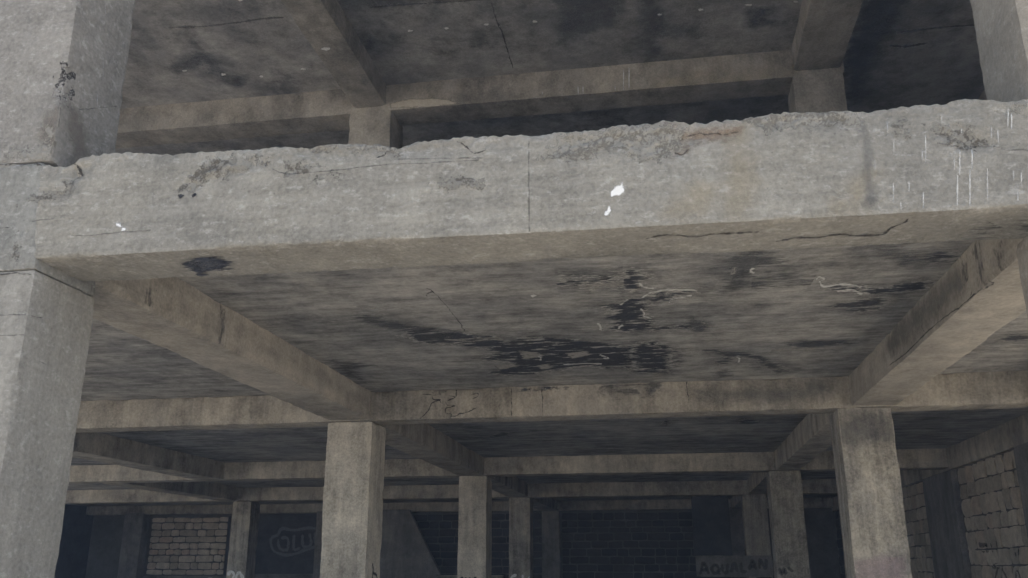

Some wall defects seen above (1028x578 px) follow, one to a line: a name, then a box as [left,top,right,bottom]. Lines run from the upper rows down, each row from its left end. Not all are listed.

leakage [356,267,856,393]
crack [646,219,908,242]
leakage [720,227,999,353]
crack [420,390,479,419]